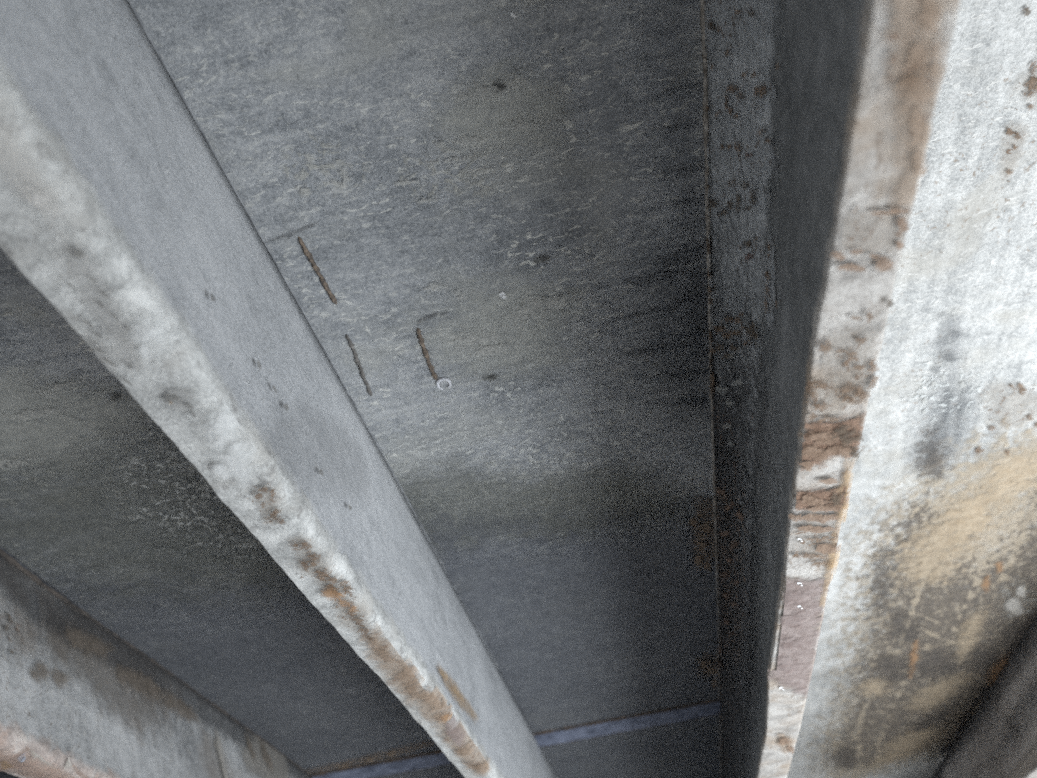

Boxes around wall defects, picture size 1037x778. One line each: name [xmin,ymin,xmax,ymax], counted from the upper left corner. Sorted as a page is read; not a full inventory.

rust [704,0,780,217]
rust [1001,128,1024,182]
rust [1011,61,1037,110]
rust [709,239,777,395]
rust [247,483,285,524]
rust [808,377,1037,778]
rust [292,537,490,776]
rust [779,734,795,754]